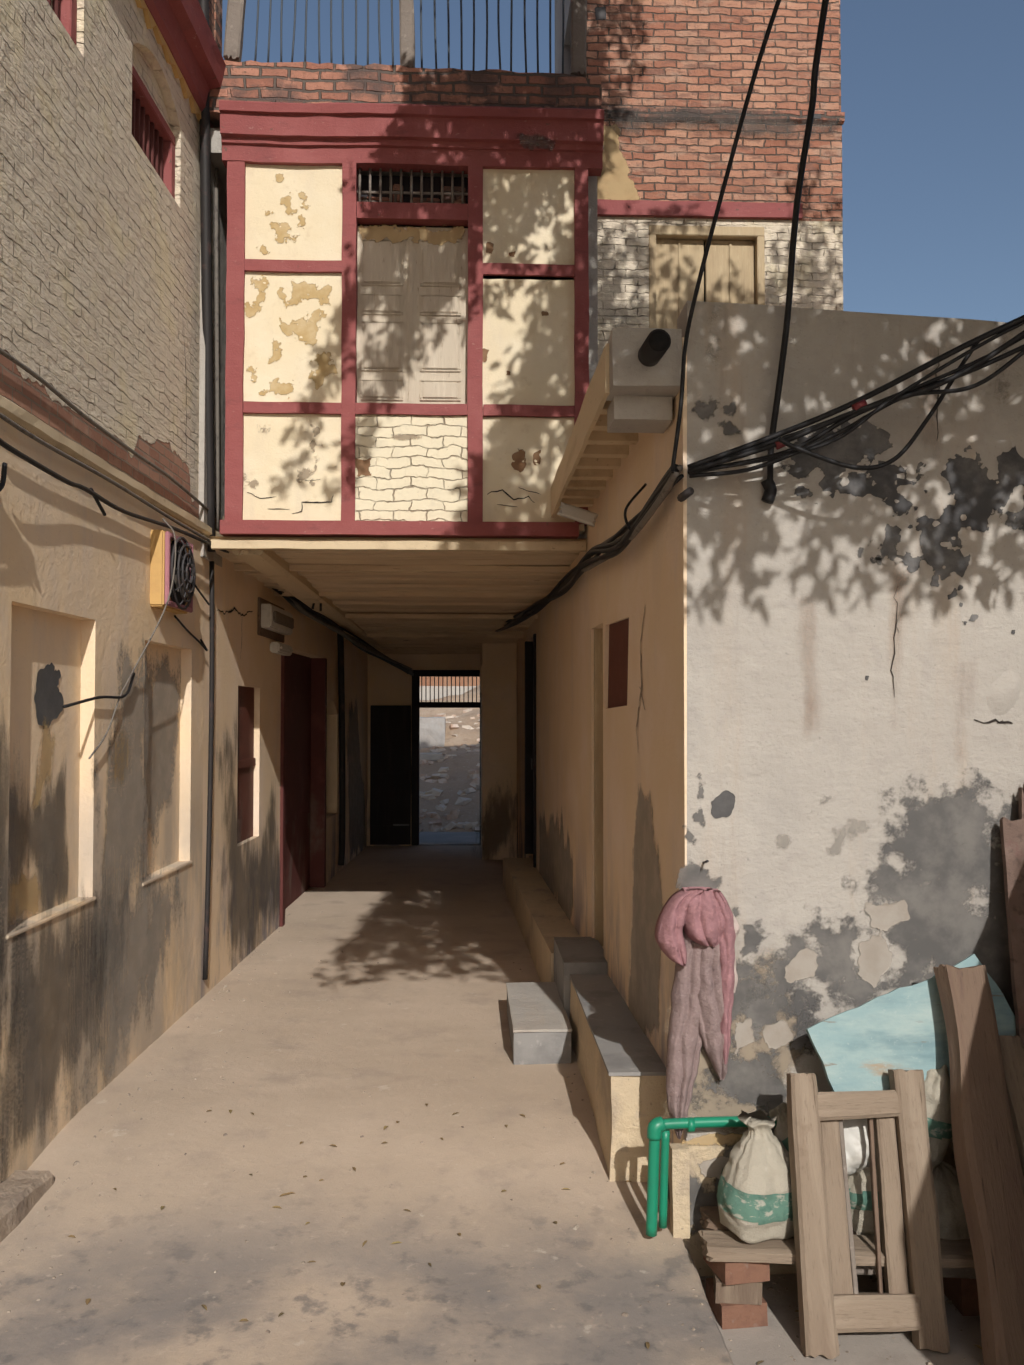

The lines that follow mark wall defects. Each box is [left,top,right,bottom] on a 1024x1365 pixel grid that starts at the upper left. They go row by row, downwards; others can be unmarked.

peeling [256,173,309,255]
peeling [244,275,338,396]
flaking render [0,350,199,519]
spalling [692,400,741,435]
crack [487,487,539,507]
spalling [781,415,1024,625]
crack [890,586,900,697]
spalling [685,773,705,845]
leakage [0,651,182,1183]
peeling [785,948,818,983]
peeling [858,900,910,988]
peeling [734,1018,793,1055]